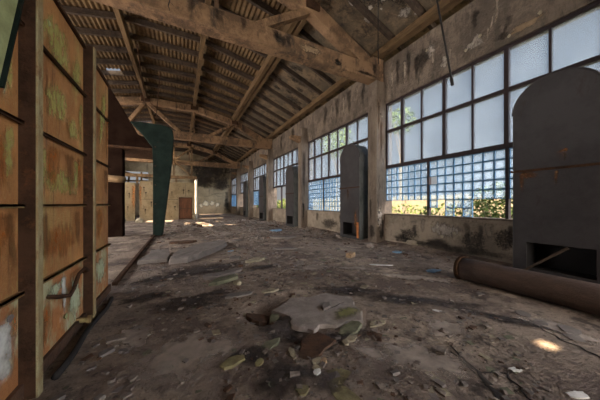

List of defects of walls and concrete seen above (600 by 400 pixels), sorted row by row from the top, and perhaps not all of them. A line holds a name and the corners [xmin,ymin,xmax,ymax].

water stain [391,50,429,87]
water stain [396,220,513,257]
crack [541,328,600,357]